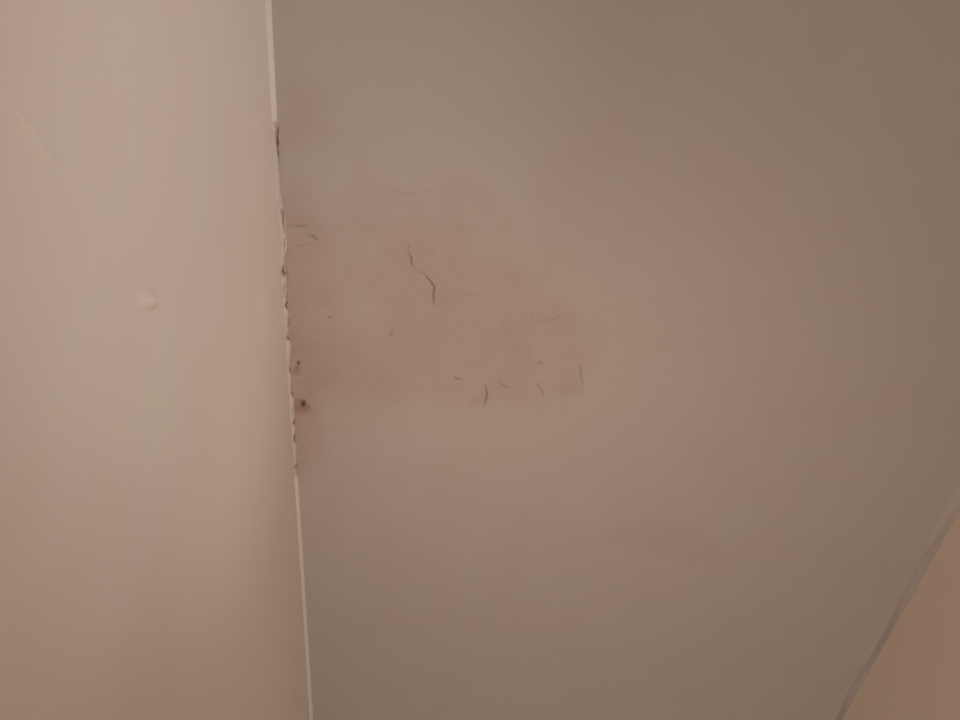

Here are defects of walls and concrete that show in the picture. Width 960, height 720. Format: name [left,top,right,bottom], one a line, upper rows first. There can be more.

crack [408,243,436,302]